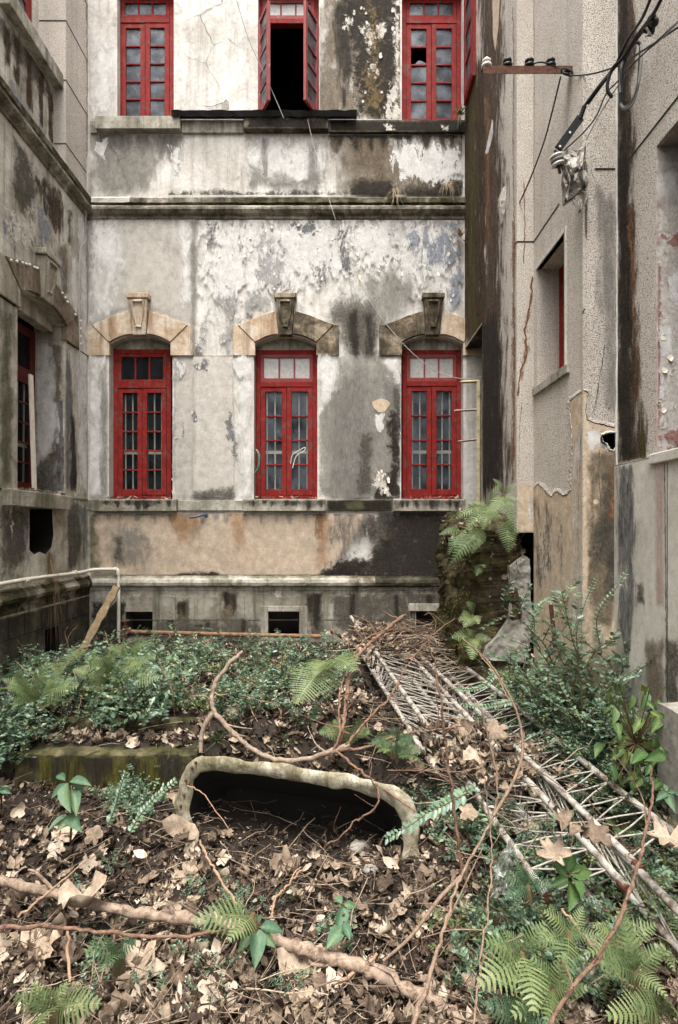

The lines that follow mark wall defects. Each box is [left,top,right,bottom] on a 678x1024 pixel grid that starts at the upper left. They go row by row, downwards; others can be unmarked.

damp [13,140,171,569]
damp [90,134,182,197]
crack [185,3,241,107]
peeling [171,219,464,497]
damp [191,265,460,576]
damp [168,0,486,354]
crack [512,10,533,483]
spalling [518,388,616,707]
corrosion [618,0,678,463]
peeling [657,205,678,434]